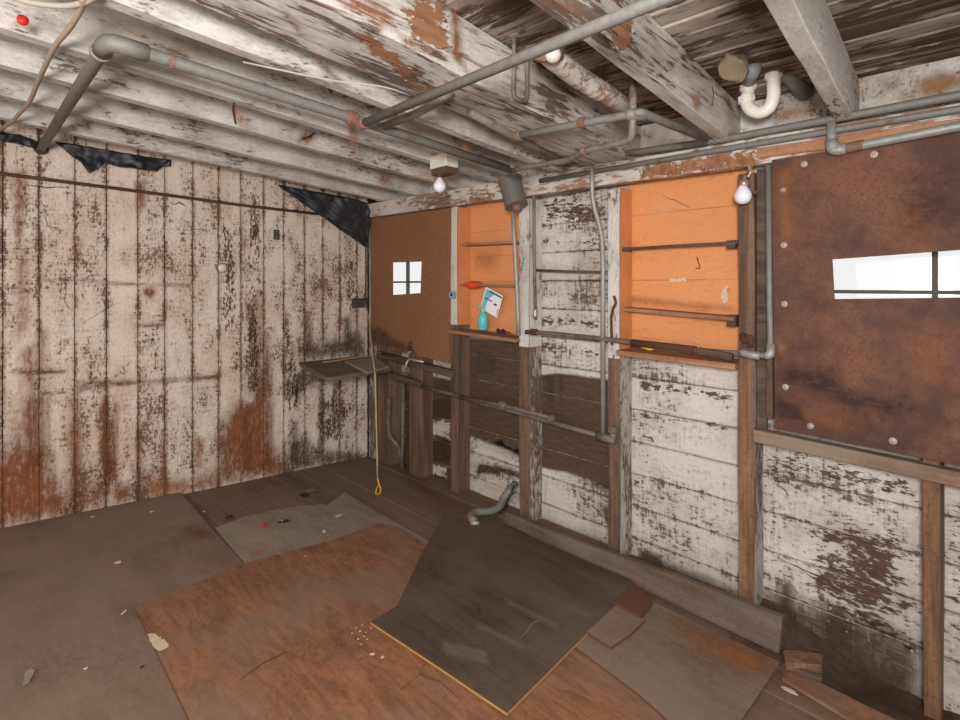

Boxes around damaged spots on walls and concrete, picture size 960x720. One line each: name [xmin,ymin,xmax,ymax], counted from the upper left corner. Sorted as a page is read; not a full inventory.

peeling [400,0,452,57]
peeling [355,31,436,91]
peeling [542,194,605,247]
peeling [219,192,265,393]
leakage [300,318,413,359]
rust [0,322,283,528]
leakage [292,371,335,425]
peeling [280,318,355,443]
leakage [290,406,359,471]
peeling [639,363,733,402]
peeling [764,455,921,502]
peeling [779,514,923,652]